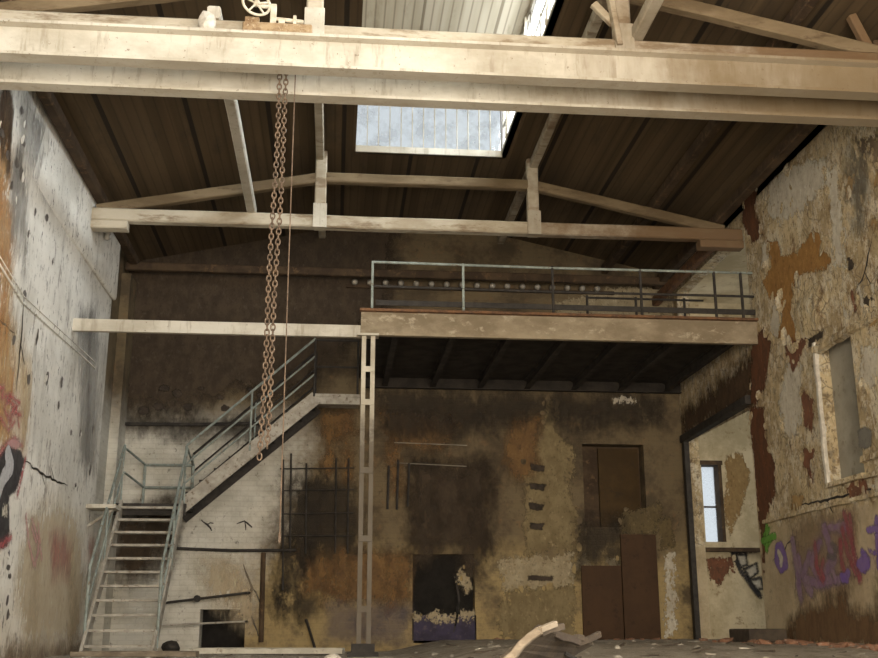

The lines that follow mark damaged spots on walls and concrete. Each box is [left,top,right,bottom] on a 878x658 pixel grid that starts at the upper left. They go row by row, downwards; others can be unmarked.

spalling [853,134,878,189]
corrosion [0,90,15,450]
spalling [845,245,855,273]
spalling [840,278,878,332]
peeling [724,188,831,580]
crack [26,461,66,485]
spalling [520,575,553,593]
peeling [706,555,736,586]